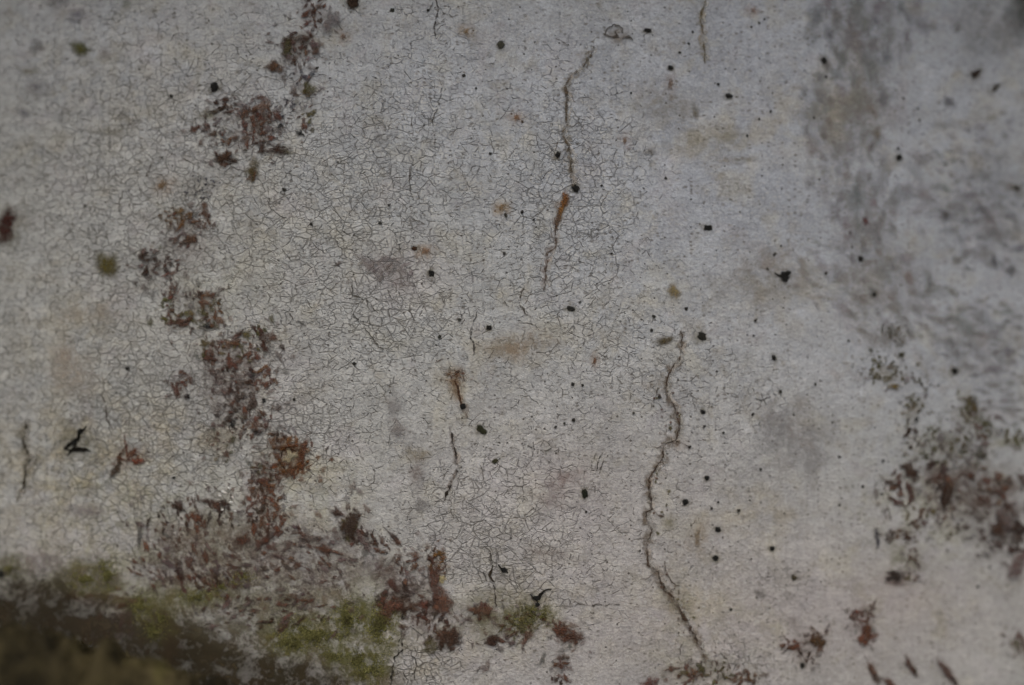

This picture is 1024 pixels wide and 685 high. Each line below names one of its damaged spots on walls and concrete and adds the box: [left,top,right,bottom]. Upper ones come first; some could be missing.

crack [562,52,596,186]
crack [399,166,424,251]
corrosion [556,192,569,229]
crack [520,217,562,315]
crack [351,286,415,350]
crack [435,311,478,501]
crack [16,418,36,501]
crack [643,330,731,680]
crack [483,547,507,607]
leakage [0,577,390,685]